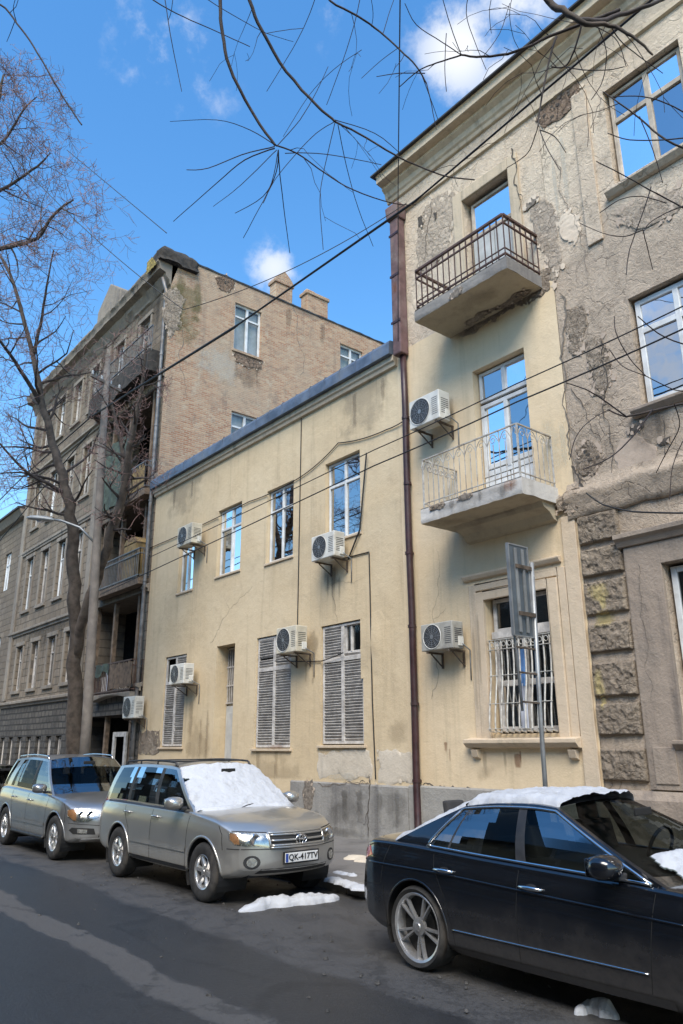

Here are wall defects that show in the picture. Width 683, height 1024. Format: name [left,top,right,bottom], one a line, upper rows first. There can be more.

flaking render [535,83,585,130]
flaking render [416,187,458,276]
spalling [215,273,235,294]
flaking render [456,194,581,339]
flaking render [162,287,186,340]
spalling [232,352,265,370]
flaking render [563,305,616,405]
flaking render [554,420,671,516]
flaking render [302,779,315,810]